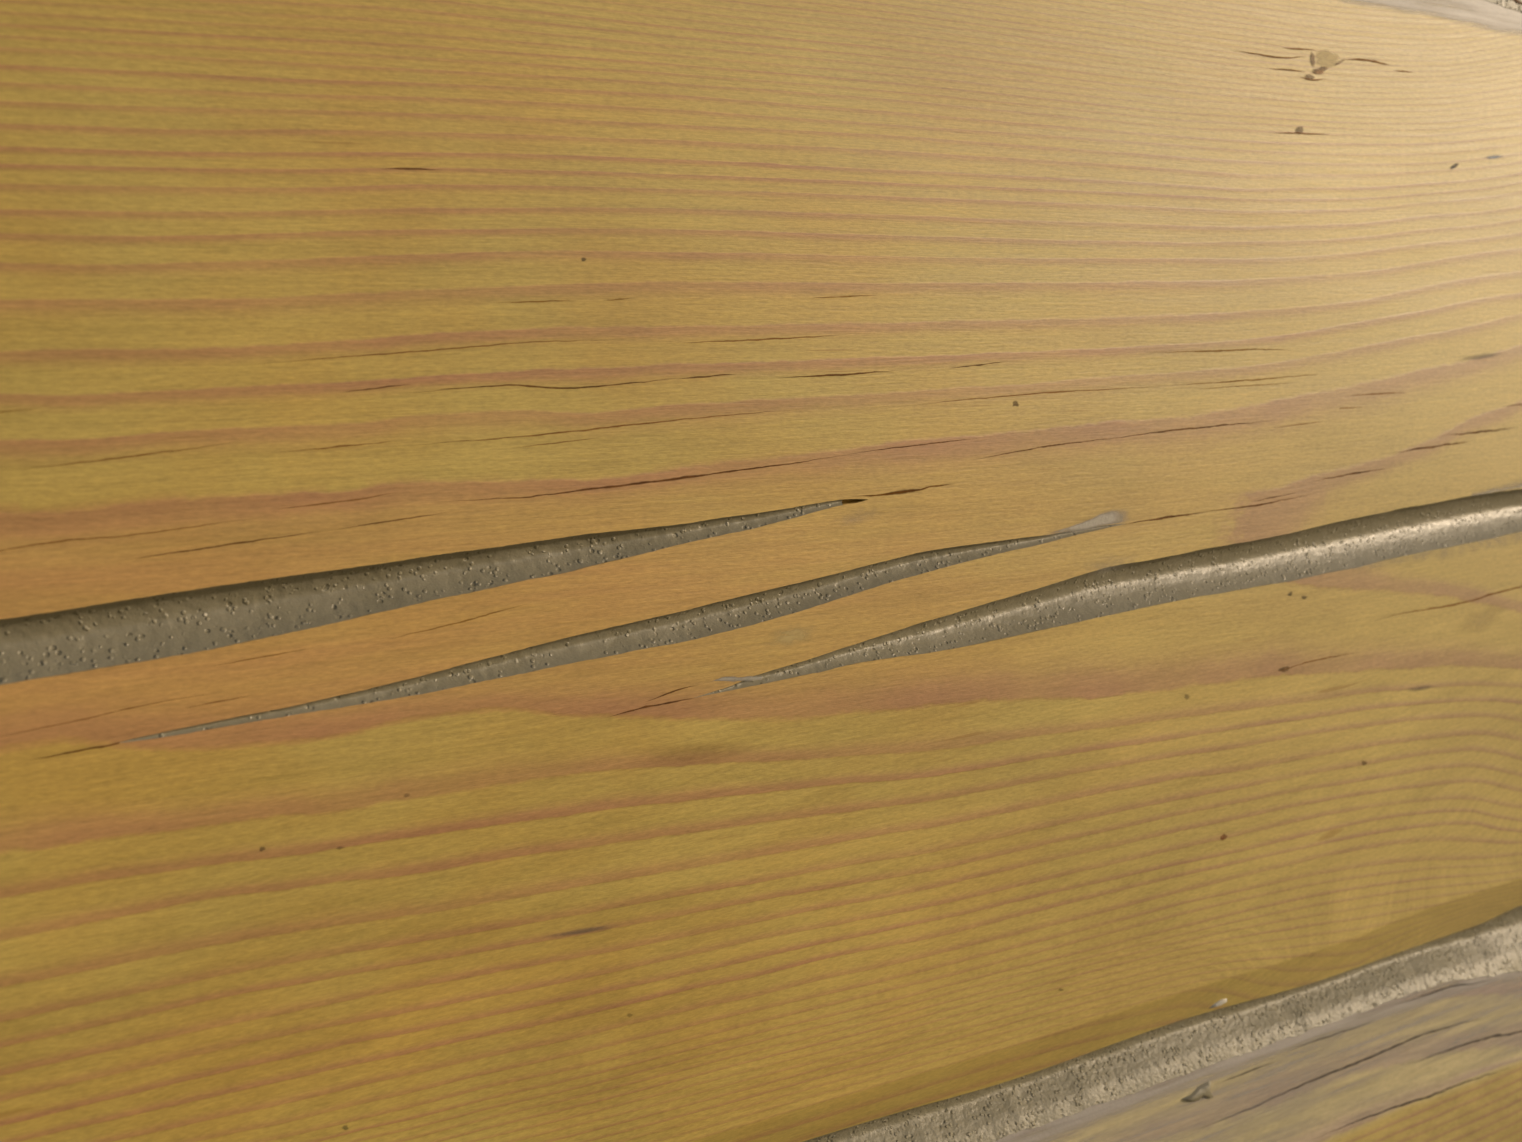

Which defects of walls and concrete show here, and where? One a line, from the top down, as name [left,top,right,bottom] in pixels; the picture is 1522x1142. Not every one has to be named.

crack [785,370,888,378]
crack [929,362,1144,404]
crack [1176,349,1316,389]
crack [866,393,1392,458]
crack [0,404,1522,760]